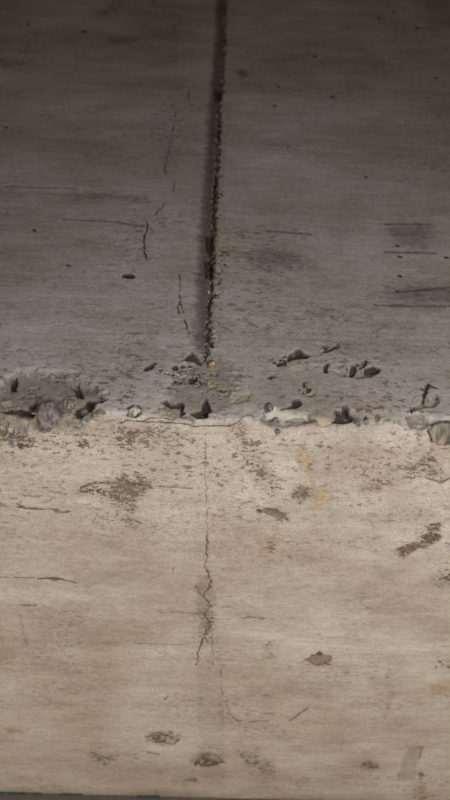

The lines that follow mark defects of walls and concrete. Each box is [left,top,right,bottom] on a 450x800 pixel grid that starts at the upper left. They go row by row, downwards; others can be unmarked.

spalling [268,350,309,379]
spalling [323,360,380,379]
spalling [261,382,385,435]
spalling [408,384,439,414]
peeling [96,424,195,451]
crack [119,414,254,467]
flaking render [427,421,450,445]
peeling [362,453,450,491]
peeling [79,475,147,524]
peeling [397,523,450,557]
crack [193,535,214,665]
spalling [305,651,332,666]